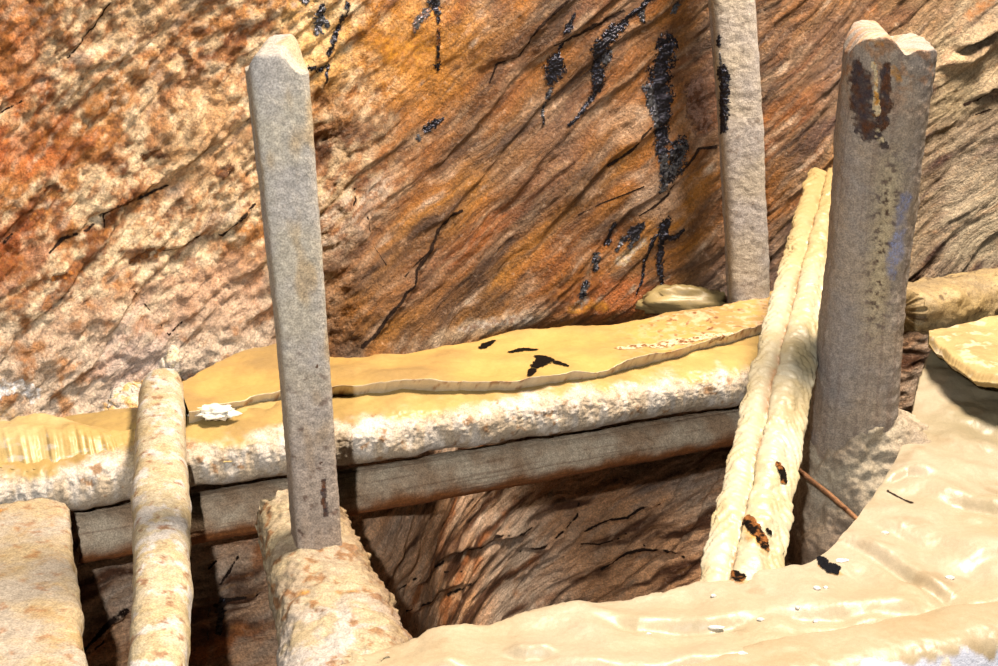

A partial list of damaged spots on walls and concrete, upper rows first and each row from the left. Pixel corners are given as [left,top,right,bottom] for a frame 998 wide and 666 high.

leakage [375,0,443,71]
leakage [541,12,576,125]
leakage [567,0,656,127]
leakage [641,31,689,195]
leakage [716,35,732,135]
crack [49,184,169,254]
crack [353,188,463,349]
leakage [573,216,685,311]
crack [399,502,685,612]